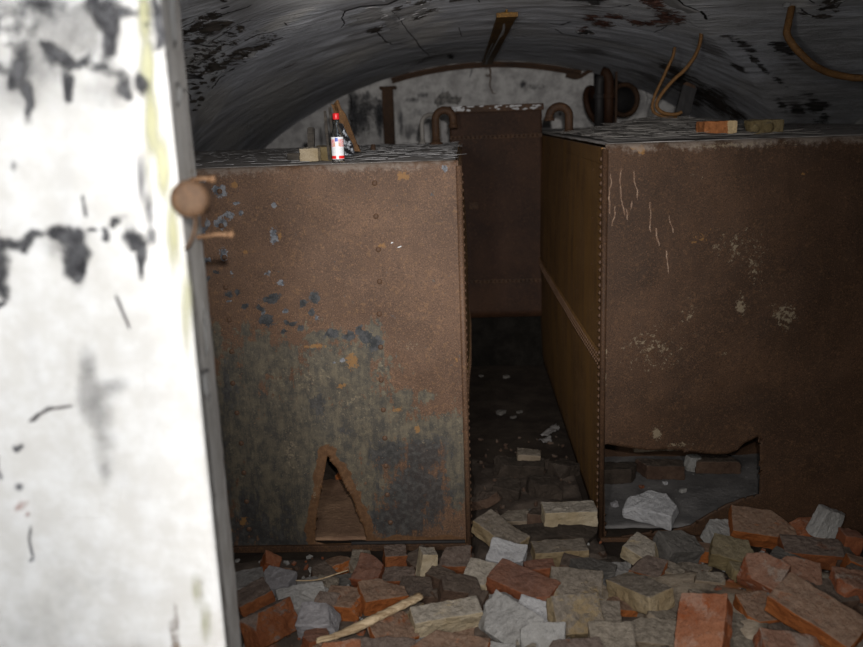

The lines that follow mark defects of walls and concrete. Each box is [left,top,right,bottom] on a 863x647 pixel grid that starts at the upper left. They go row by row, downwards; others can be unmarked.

peeling [168,0,283,111]
crack [338,0,478,56]
corrosion [608,169,638,224]